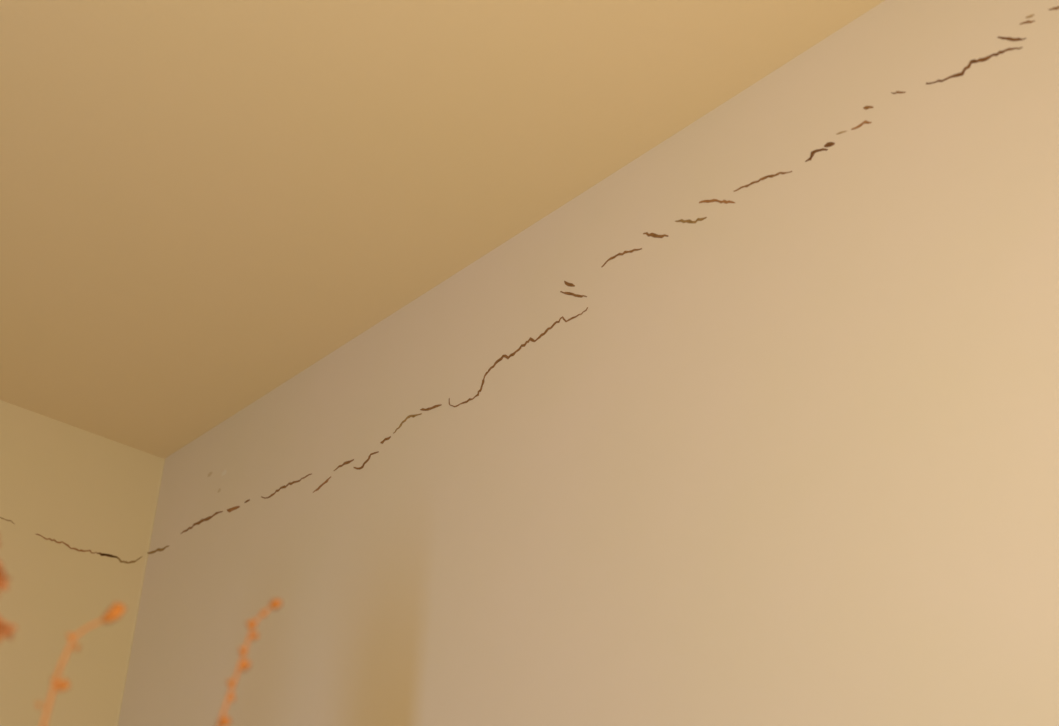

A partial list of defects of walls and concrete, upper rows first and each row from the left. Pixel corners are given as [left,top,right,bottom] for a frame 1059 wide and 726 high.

crack [601,6,1059,267]
crack [0,281,588,564]